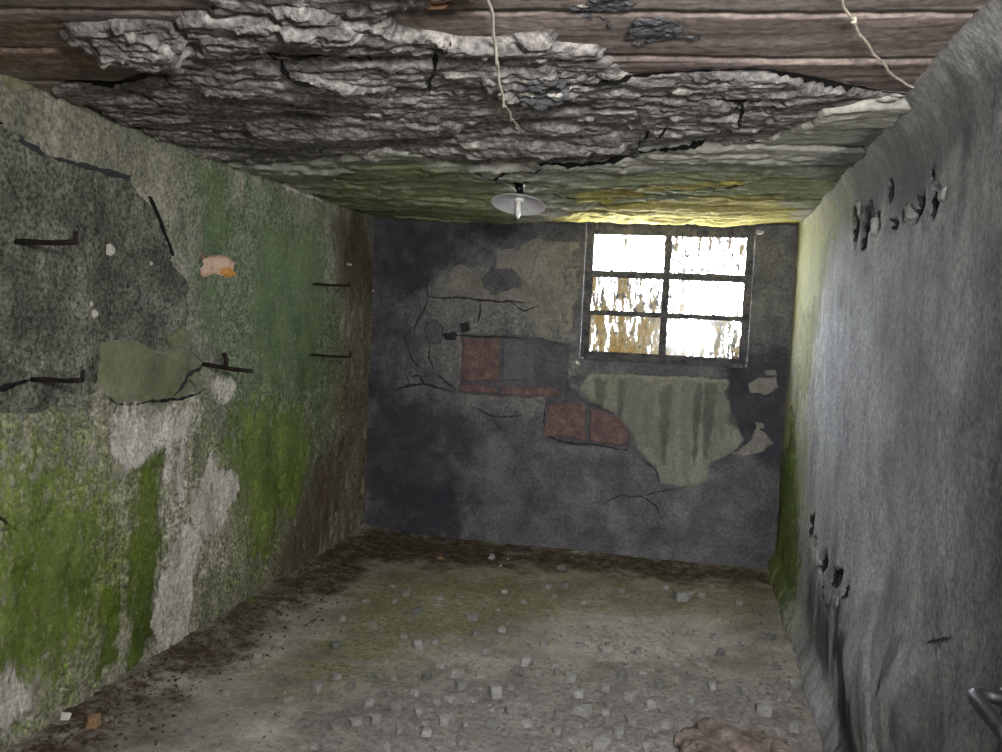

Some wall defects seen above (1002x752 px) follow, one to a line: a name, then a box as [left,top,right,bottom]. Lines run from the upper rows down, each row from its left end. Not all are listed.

peeling [50,0,911,224]
spalling [853,177,947,251]
spalling [199,254,236,279]
crack [0,379,30,392]
crack [391,269,675,521]
peeling [424,238,774,487]
peeling [748,370,779,395]
peeling [109,401,240,653]
water stain [247,437,350,577]
spalling [809,513,850,611]
water stain [95,580,153,680]